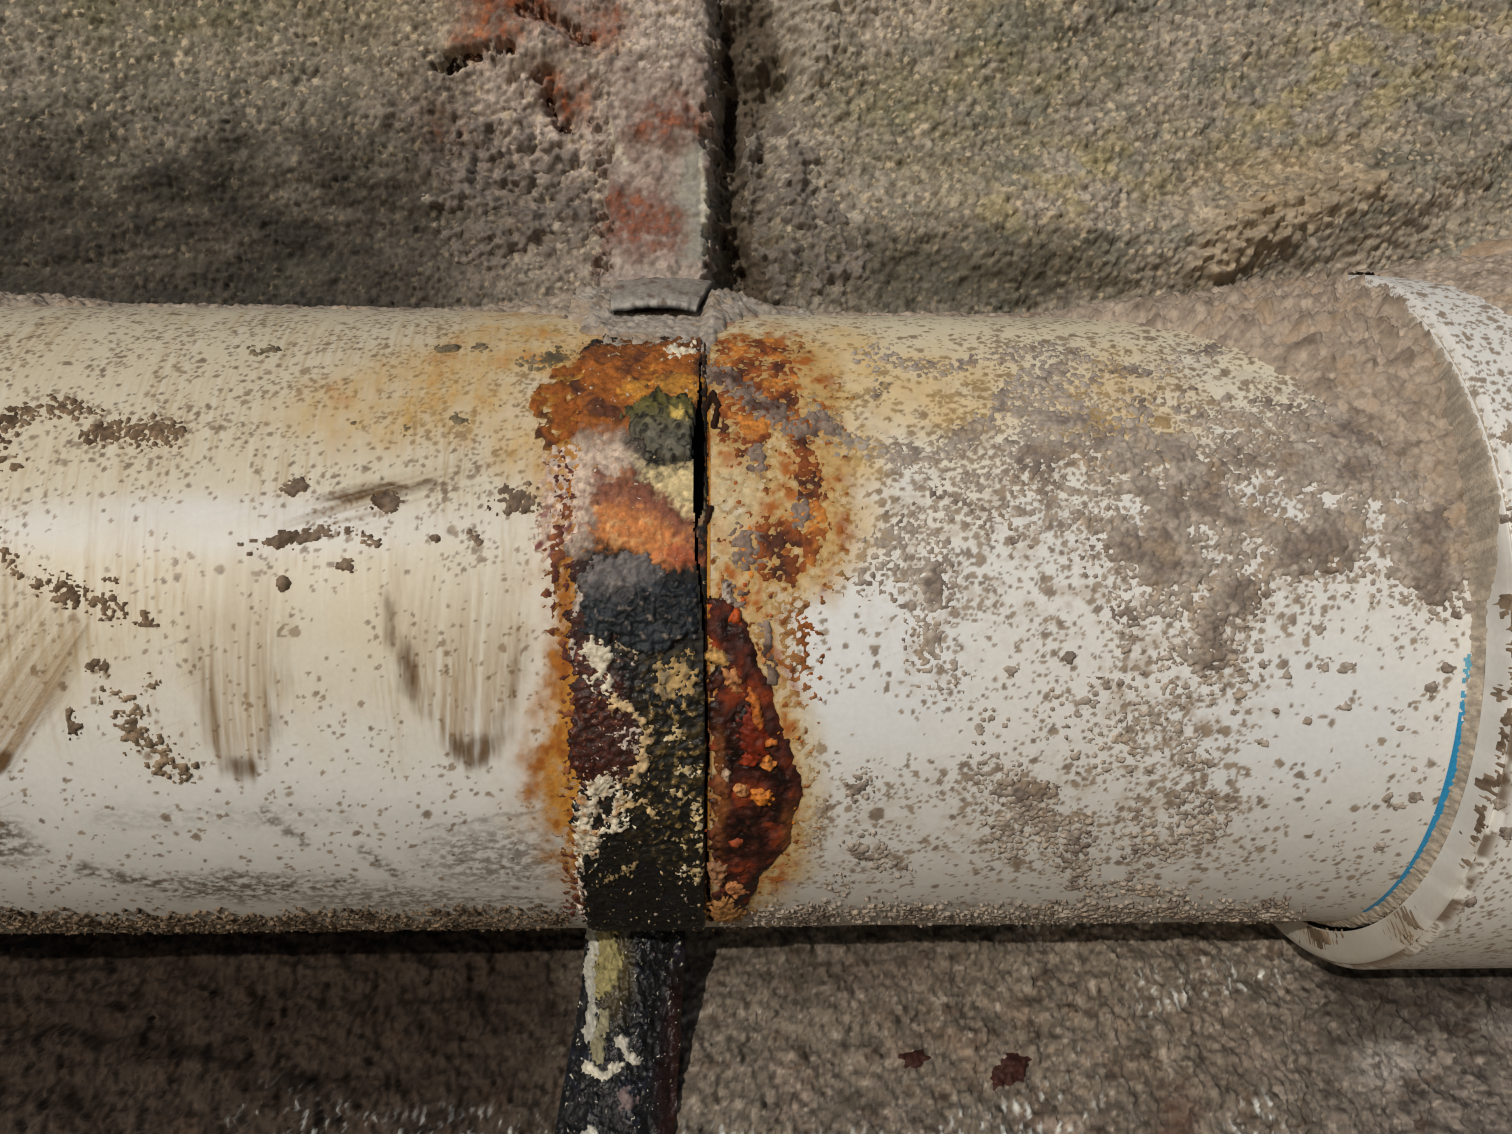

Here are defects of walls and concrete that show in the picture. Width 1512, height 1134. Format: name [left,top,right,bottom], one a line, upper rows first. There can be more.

rust [498,327,586,924]
rust [696,321,866,932]